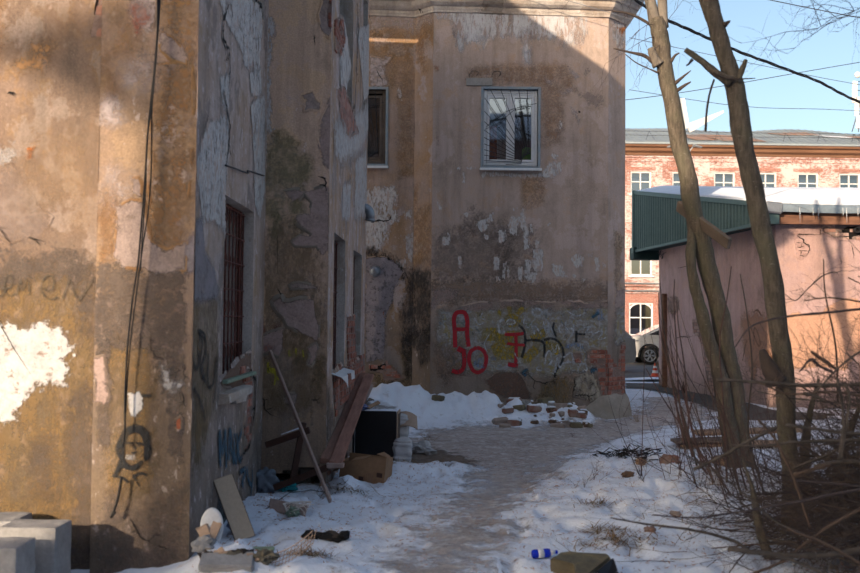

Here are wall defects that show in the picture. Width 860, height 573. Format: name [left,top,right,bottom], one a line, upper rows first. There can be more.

spalling [88,0,102,41]
peeling [220,0,265,220]
peeling [300,0,430,252]
peeling [457,66,572,183]
peeling [477,207,626,312]
spalling [217,349,253,450]
spalling [263,293,321,368]
damp [366,246,608,387]
spalling [572,342,626,396]